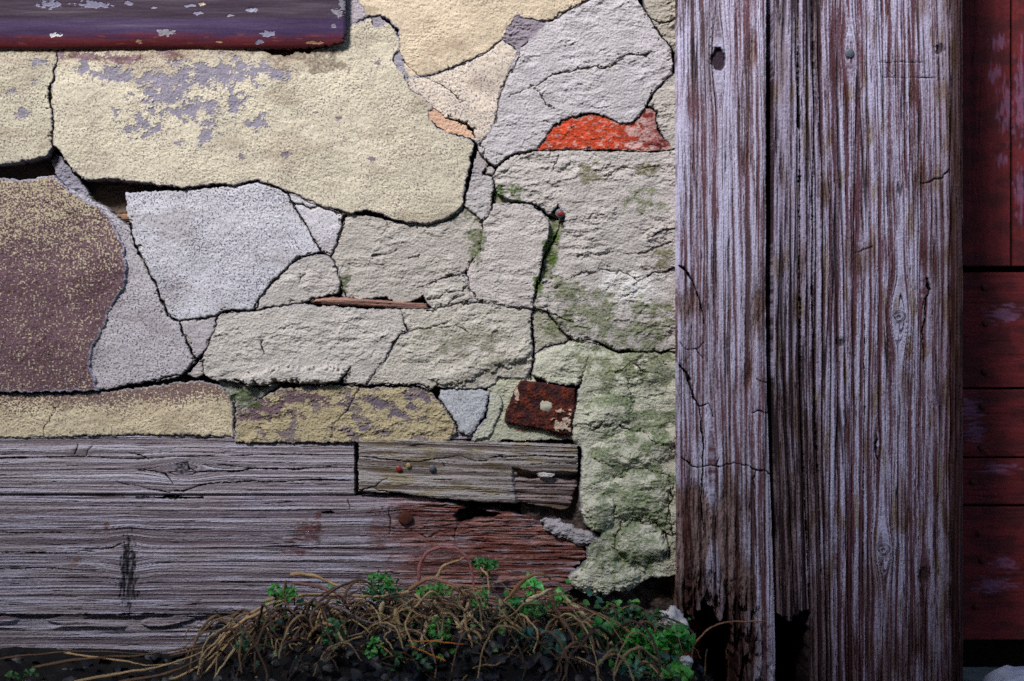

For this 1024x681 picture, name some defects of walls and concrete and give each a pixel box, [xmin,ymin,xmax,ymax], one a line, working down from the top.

peeling [35,0,134,10]
peeling [331,0,346,28]
peeling [29,30,324,148]
peeling [14,107,32,120]
spalling [537,109,671,152]
flaking render [0,150,143,225]
crack [0,0,770,557]
rust [551,409,572,437]